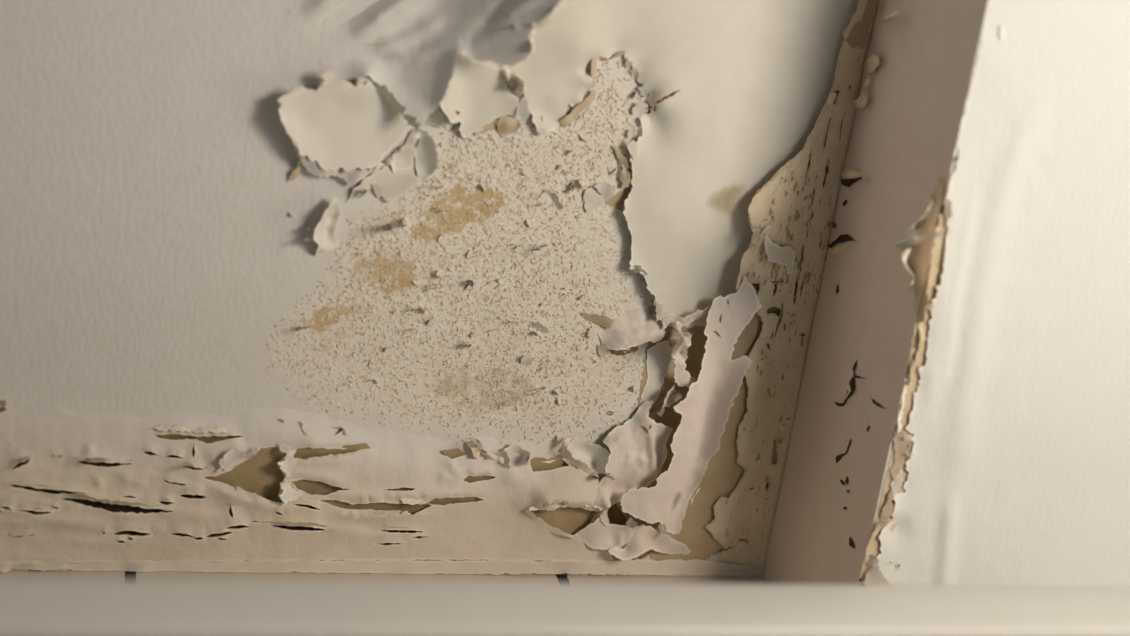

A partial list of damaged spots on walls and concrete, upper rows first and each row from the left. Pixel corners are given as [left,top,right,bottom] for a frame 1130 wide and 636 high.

peeling [853,54,880,108]
peeling [841,169,866,187]
leakage [414,185,503,240]
peeling [241,0,859,561]
flaking render [858,177,954,585]